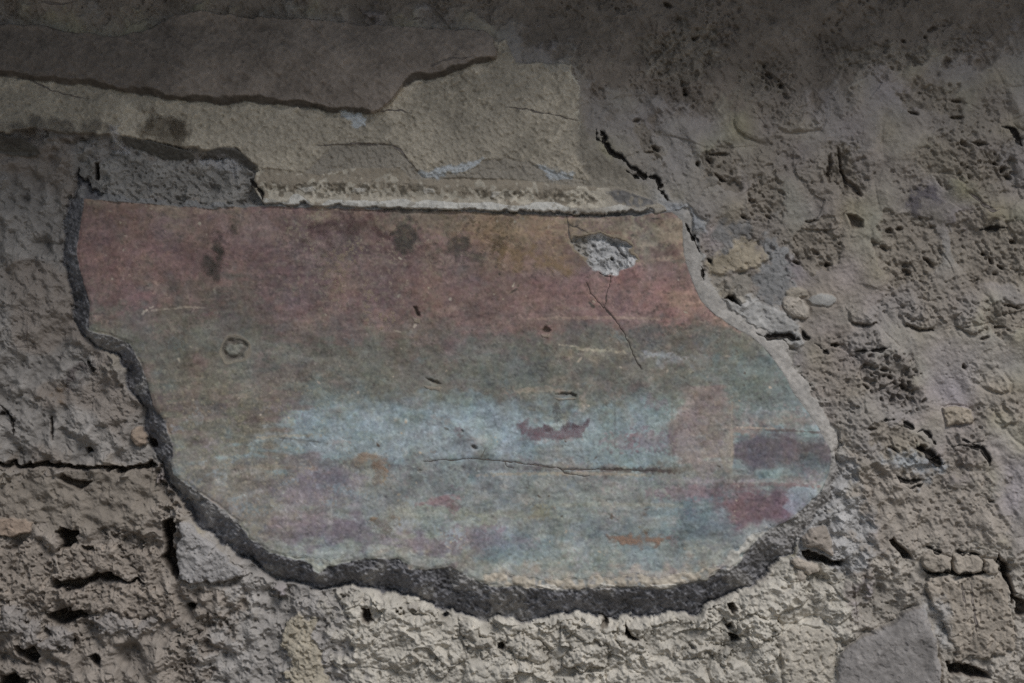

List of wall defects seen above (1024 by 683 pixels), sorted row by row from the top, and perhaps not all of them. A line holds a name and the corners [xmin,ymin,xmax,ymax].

crack [510,107,668,200]
spalling [567,230,640,276]
crack [429,450,653,476]